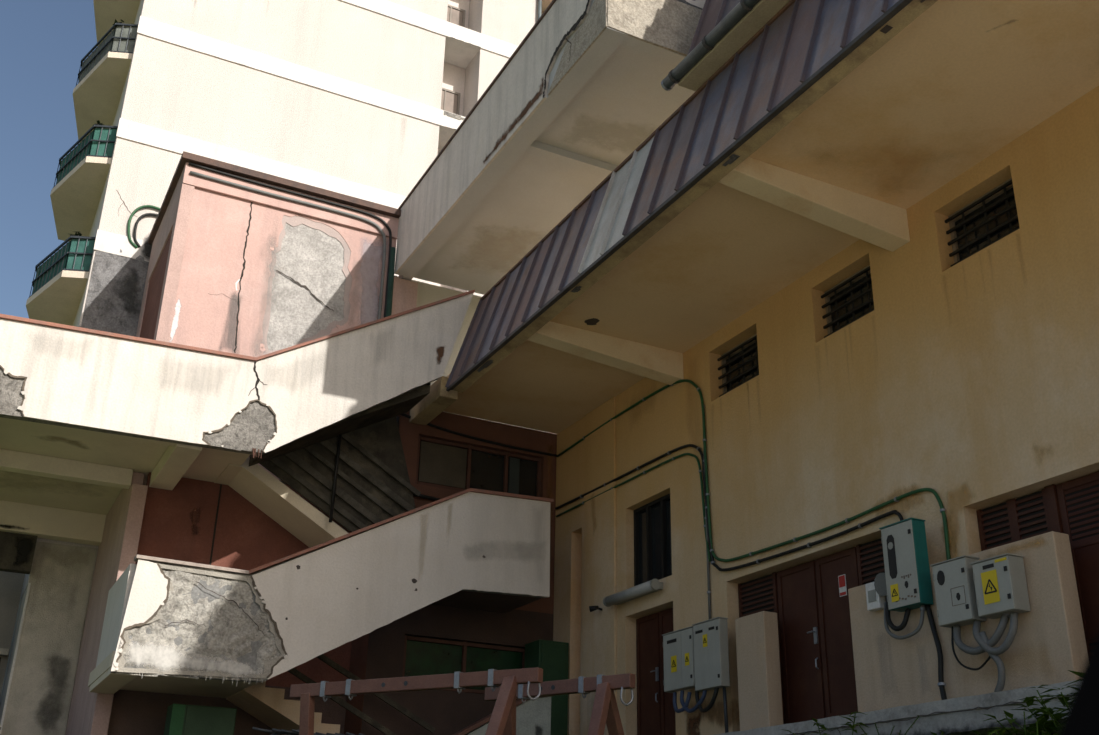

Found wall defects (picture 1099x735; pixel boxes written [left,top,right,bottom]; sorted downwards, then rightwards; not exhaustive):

crack [543,0,590,97]
crack [208,202,267,400]
peeling [260,214,352,355]
spalling [0,367,26,417]
spalling [204,401,277,458]
spalling [114,562,289,686]
leakage [38,657,68,728]